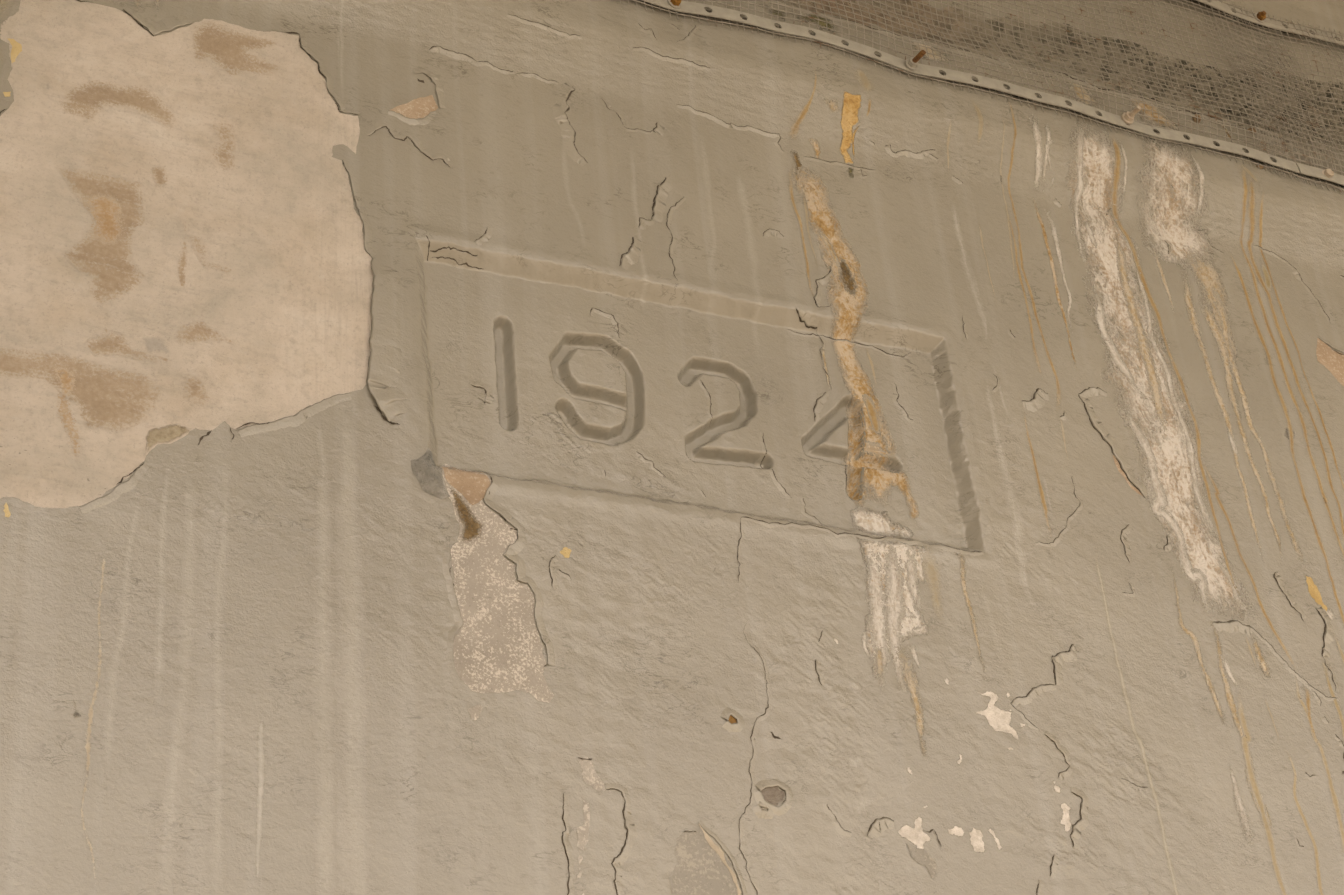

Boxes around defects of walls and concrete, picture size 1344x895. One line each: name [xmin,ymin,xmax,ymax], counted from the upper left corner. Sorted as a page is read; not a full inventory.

peeling [0,0,408,517]
crack [619,177,686,281]
corrosion [787,65,920,519]
leakage [1029,114,1309,670]
peeling [1316,335,1344,386]
peeling [411,448,555,703]
crack [562,793,575,895]
crack [605,782,637,895]
peeling [669,821,748,895]
leakage [840,505,945,761]
crack [1009,644,1089,895]
crack [1213,572,1344,780]